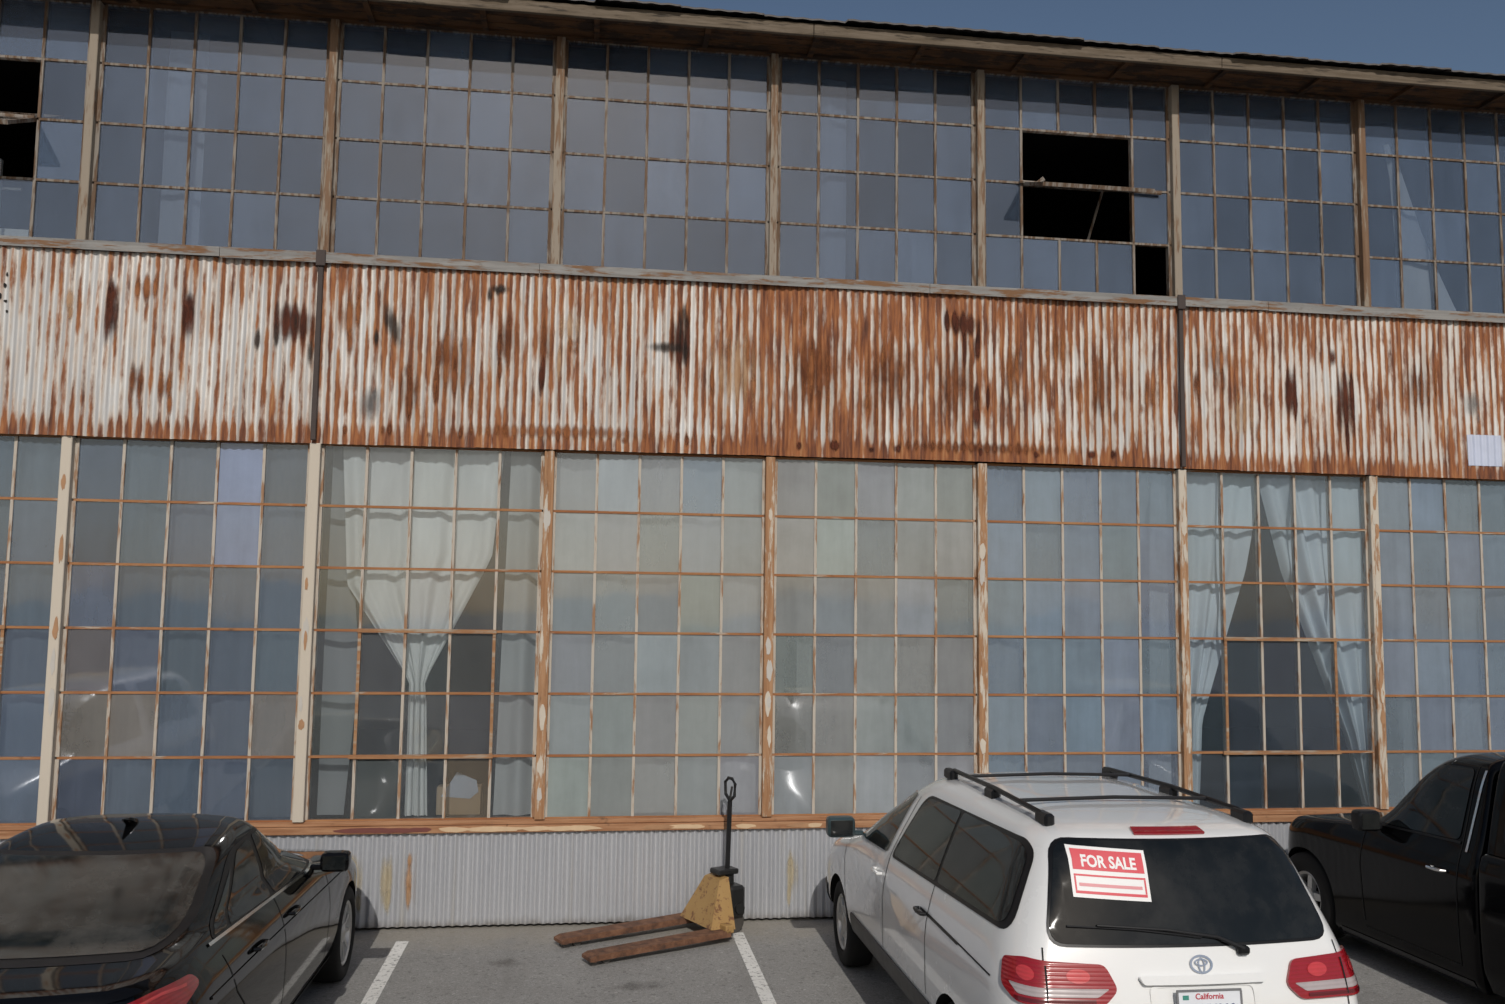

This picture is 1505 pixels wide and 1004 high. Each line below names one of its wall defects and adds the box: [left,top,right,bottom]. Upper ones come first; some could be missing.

corrosion [104,280,118,340]
corrosion [130,368,172,414]
corrosion [182,296,194,334]
corrosion [254,303,313,360]
corrosion [401,329,645,442]
corrosion [671,309,690,368]
corrosion [865,345,916,452]
corrosion [894,311,1051,458]
corrosion [1076,340,1117,458]
corrosion [1194,342,1260,450]
corrosion [1286,369,1298,419]
corrosion [1330,352,1355,454]